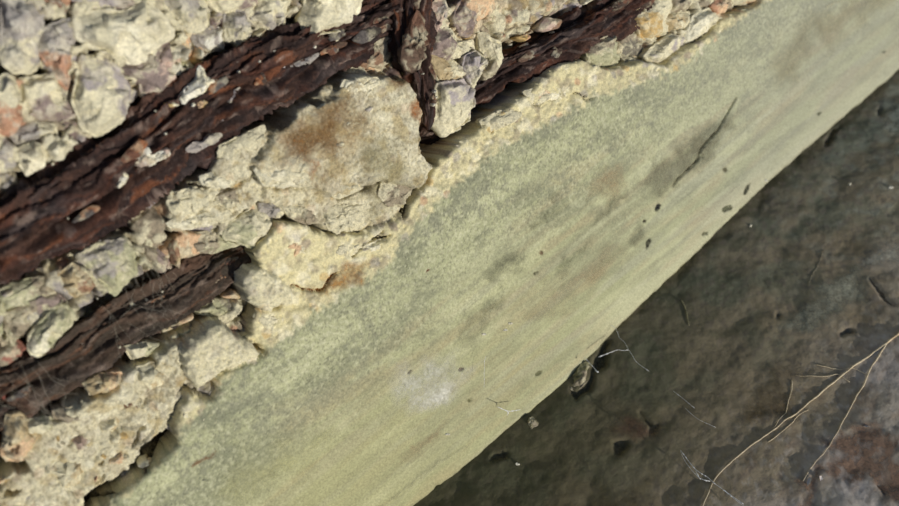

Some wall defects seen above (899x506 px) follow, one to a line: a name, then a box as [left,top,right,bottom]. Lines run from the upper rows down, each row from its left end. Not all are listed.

corrosion [0,0,441,285]
corrosion [472,0,655,109]
spalling [575,0,757,68]
corrosion [0,245,251,433]
spalling [0,0,593,506]